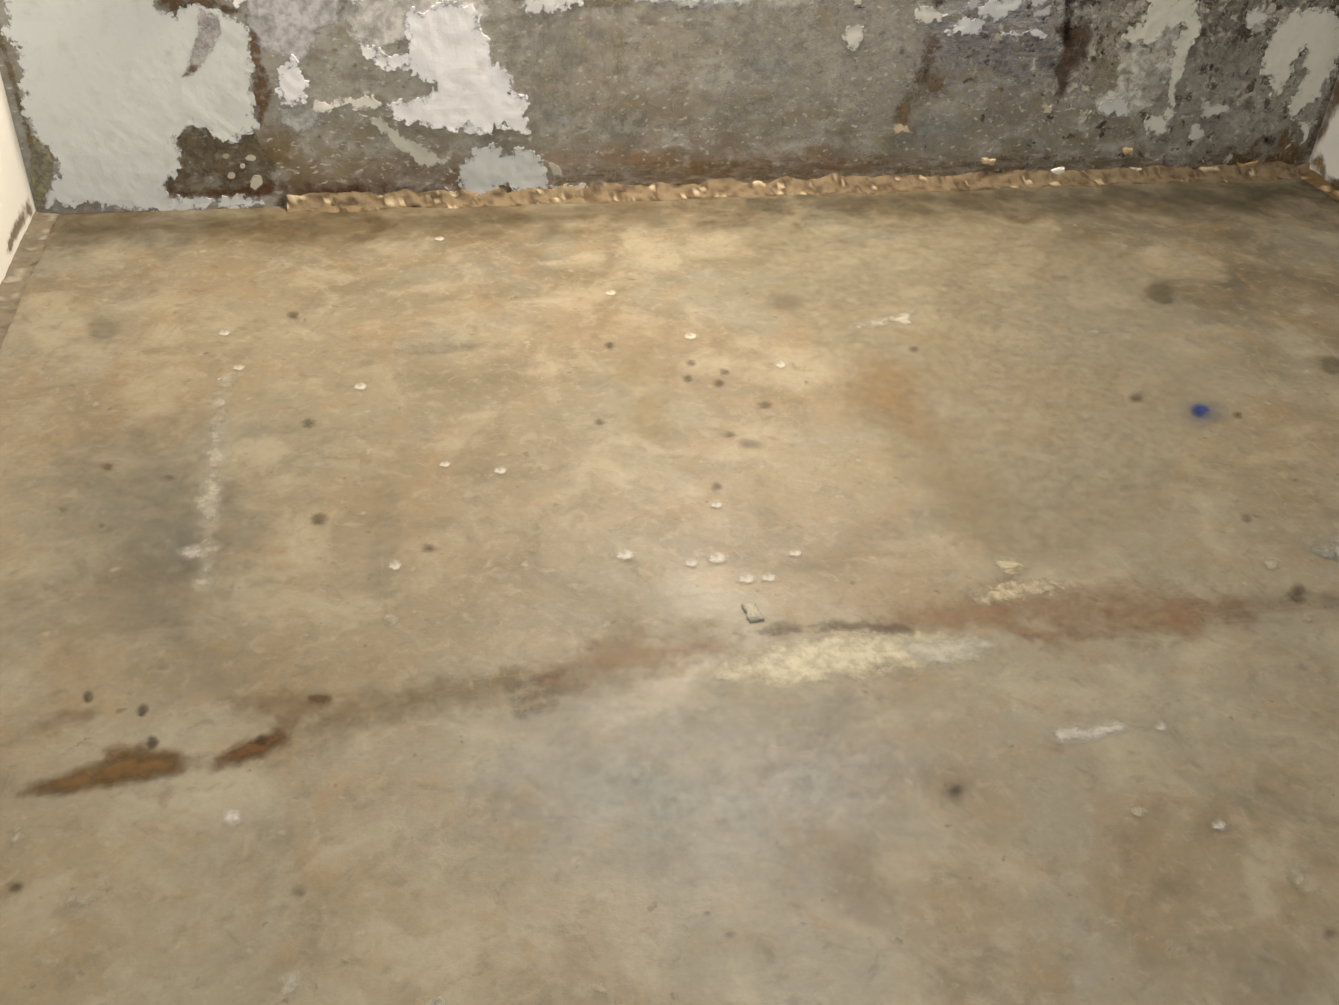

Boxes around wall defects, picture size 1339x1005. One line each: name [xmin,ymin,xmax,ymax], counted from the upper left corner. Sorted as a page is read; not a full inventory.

peeling [0,0,586,251]
peeling [842,25,864,51]
rust [1054,23,1105,95]
peeling [915,0,1339,190]
rust [34,737,179,792]
rust [217,732,283,766]